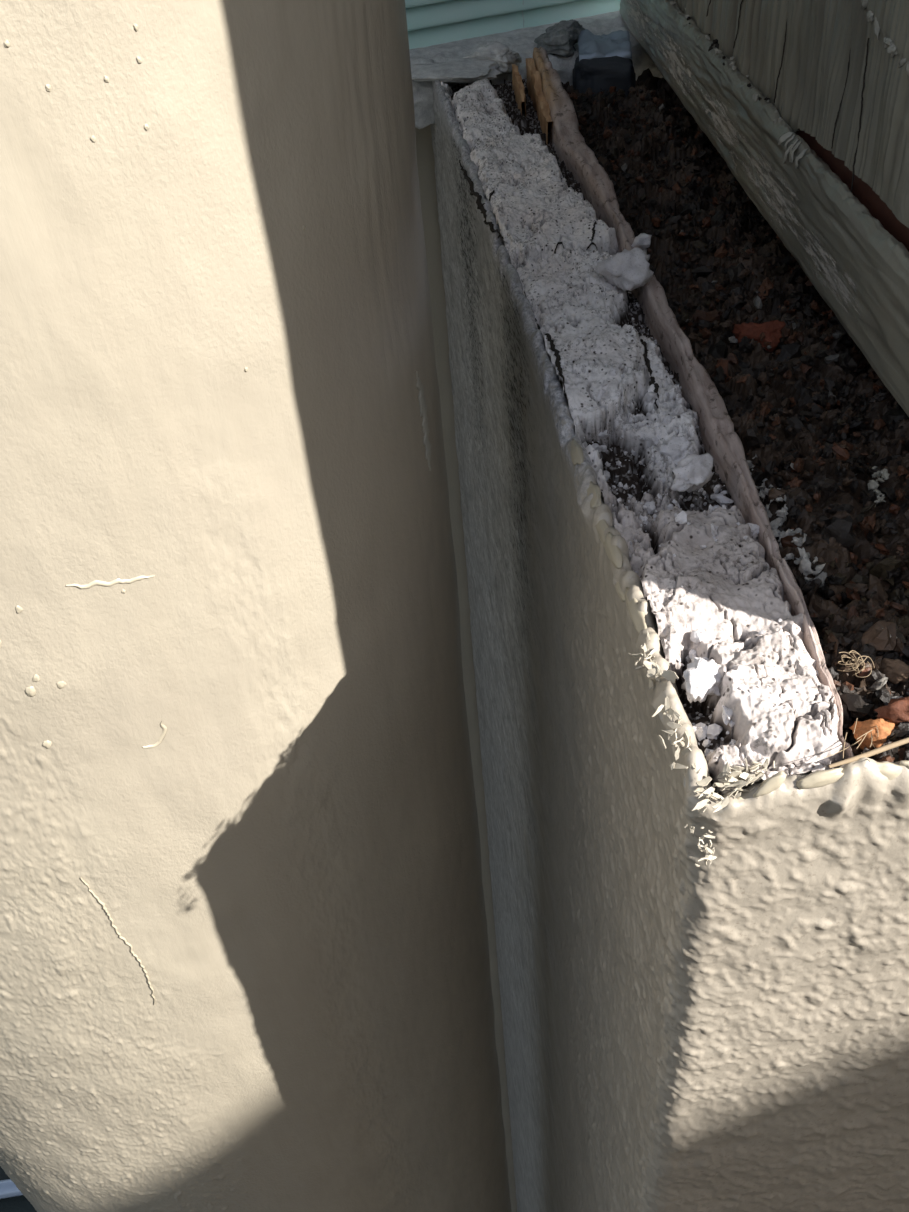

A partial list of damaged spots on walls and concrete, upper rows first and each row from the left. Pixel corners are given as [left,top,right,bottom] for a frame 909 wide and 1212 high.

crack [733,0,743,48]
peeling [623,0,862,322]
crack [774,22,787,103]
crack [831,38,869,192]
peeling [628,631,679,689]
peeling [651,697,775,867]